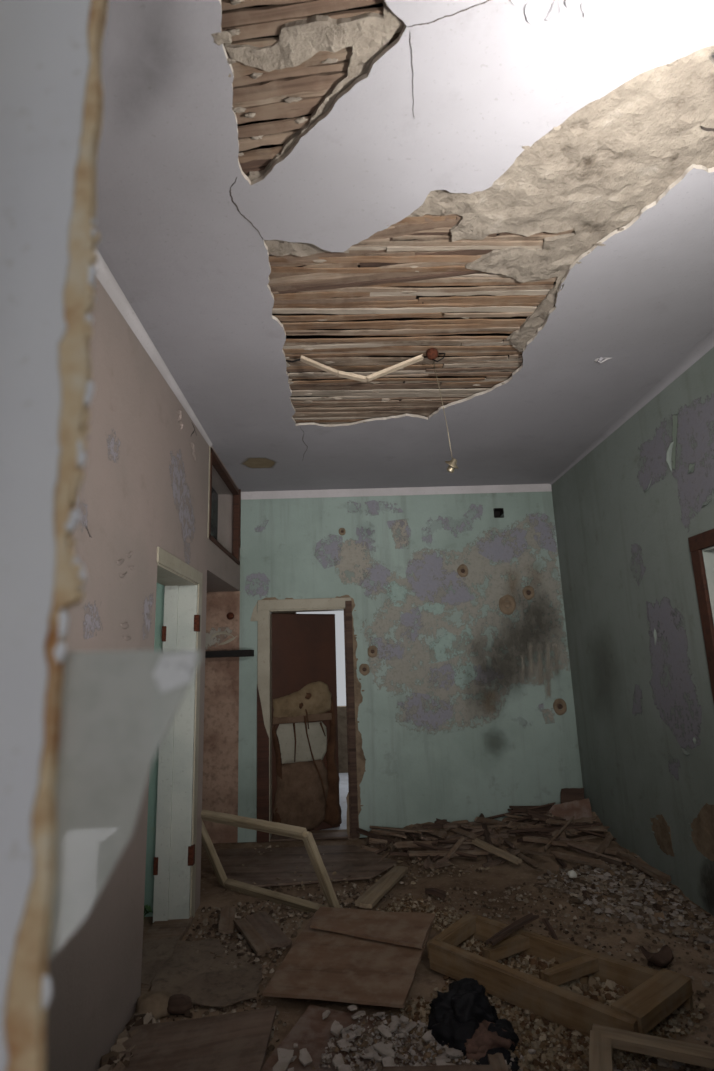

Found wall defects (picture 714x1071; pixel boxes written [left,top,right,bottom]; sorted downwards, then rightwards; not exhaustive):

spalling [211,0,405,181]
crack [407,0,490,116]
crack [230,178,263,239]
spalling [264,45,714,425]
spalling [335,595,378,840]
leakage [481,605,558,703]
spalling [539,698,567,724]